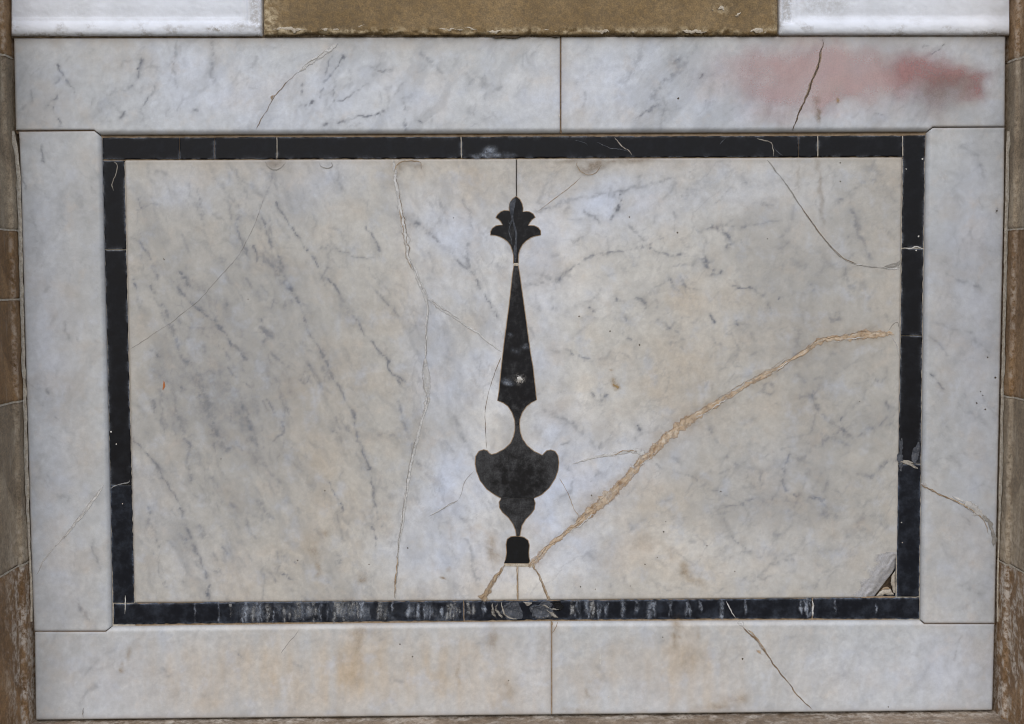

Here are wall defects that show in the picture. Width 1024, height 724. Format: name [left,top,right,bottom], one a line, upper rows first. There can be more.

crack [793,42,824,129]
crack [757,138,923,270]
crack [392,162,501,598]
crack [478,322,899,633]
crack [921,483,997,545]
spalling [857,542,903,597]
crack [727,603,811,708]